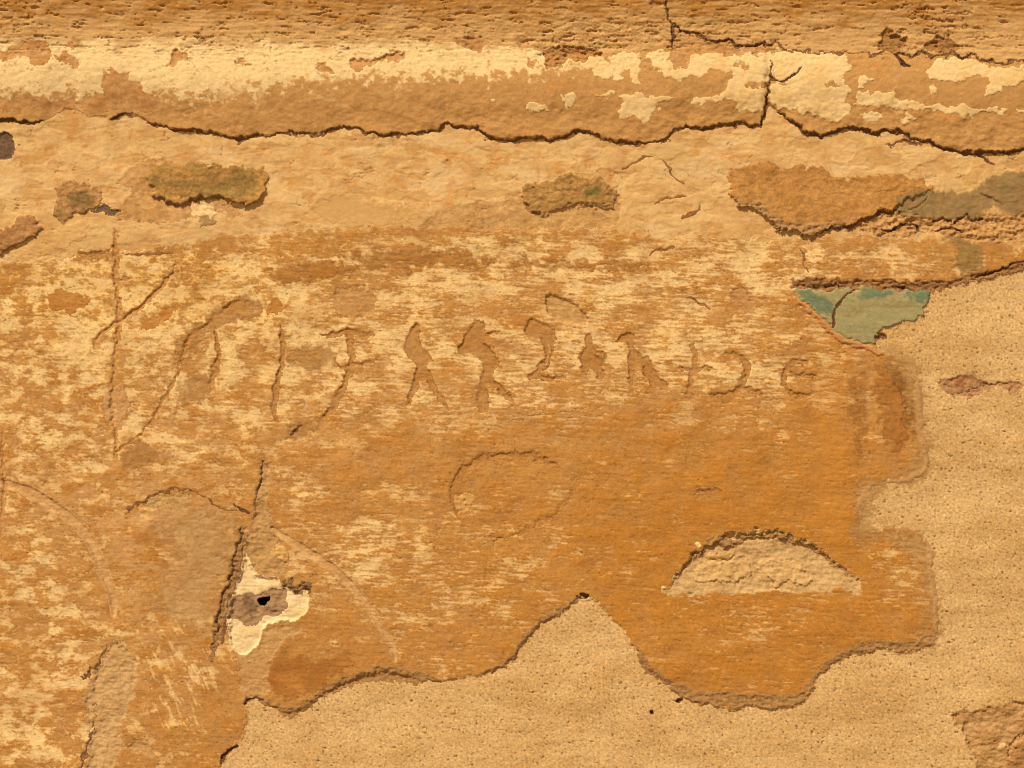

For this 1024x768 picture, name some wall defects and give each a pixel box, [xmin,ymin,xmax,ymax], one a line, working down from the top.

crack [0,117,43,125]
peeling [0,37,81,69]
peeling [0,67,164,117]
peeling [349,50,405,72]
crack [110,0,1024,219]
peeling [517,34,1024,125]
crack [125,460,263,662]
spalling [661,527,863,598]
flaking render [483,595,584,674]
flaking render [637,631,939,710]
flaking render [217,665,441,768]
spalling [951,700,1024,768]